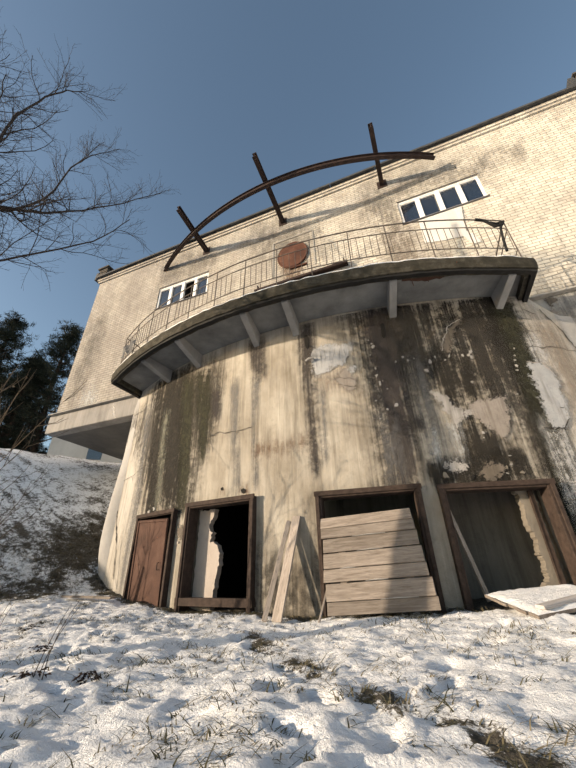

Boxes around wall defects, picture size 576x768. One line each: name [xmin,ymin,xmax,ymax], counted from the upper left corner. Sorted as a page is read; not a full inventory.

leakage [119,360,224,589]
leakage [232,385,240,487]
leakage [249,342,266,417]
leakage [298,323,327,474]
peeling [304,335,360,393]
leakage [337,300,515,485]
flaking render [427,390,539,493]
crack [505,305,576,351]
peeling [513,348,572,429]